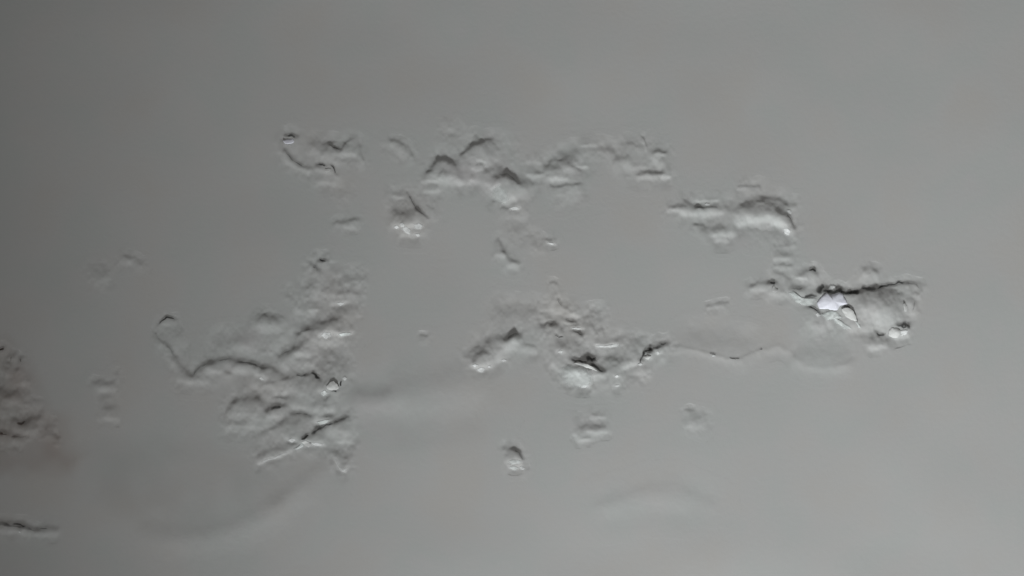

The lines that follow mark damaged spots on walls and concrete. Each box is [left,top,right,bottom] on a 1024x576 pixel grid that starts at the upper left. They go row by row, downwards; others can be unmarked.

spalling [737,255,934,363]